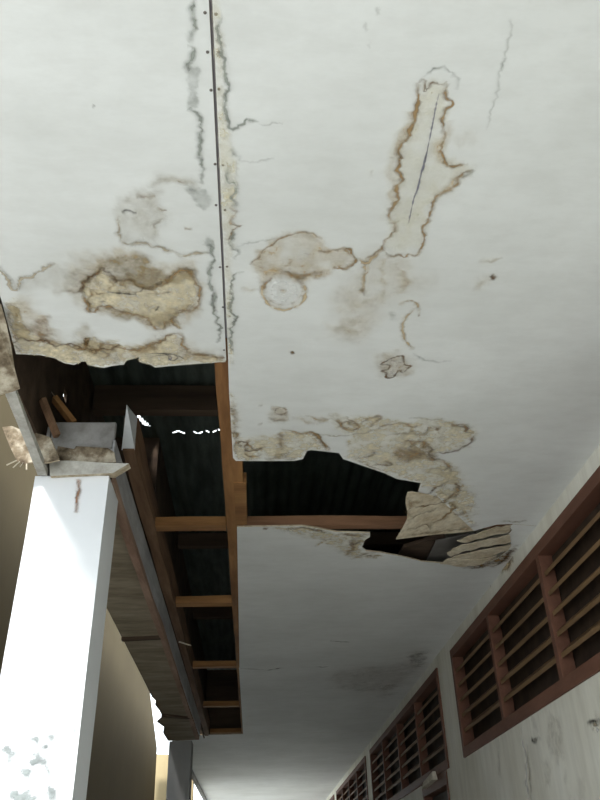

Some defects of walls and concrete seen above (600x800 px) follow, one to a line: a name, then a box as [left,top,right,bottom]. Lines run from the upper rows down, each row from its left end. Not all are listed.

damp [216,25,253,130]
damp [193,111,203,176]
damp [388,82,465,258]
damp [0,264,52,291]
damp [8,246,238,366]
damp [261,270,292,311]
damp [323,229,396,281]